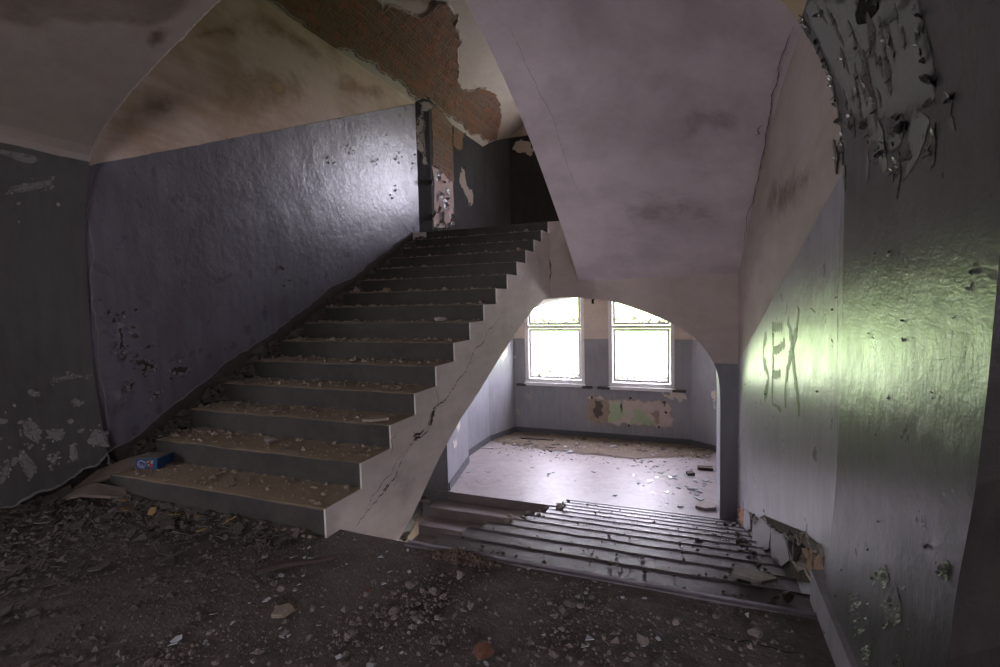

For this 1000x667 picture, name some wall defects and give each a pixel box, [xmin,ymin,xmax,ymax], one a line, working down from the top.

flaking render [268,0,502,231]
peeling [512,139,534,156]
crack [743,29,793,247]
peeling [798,0,954,199]
flaking render [0,172,413,510]
crack [358,319,499,524]
flaking render [732,502,825,585]